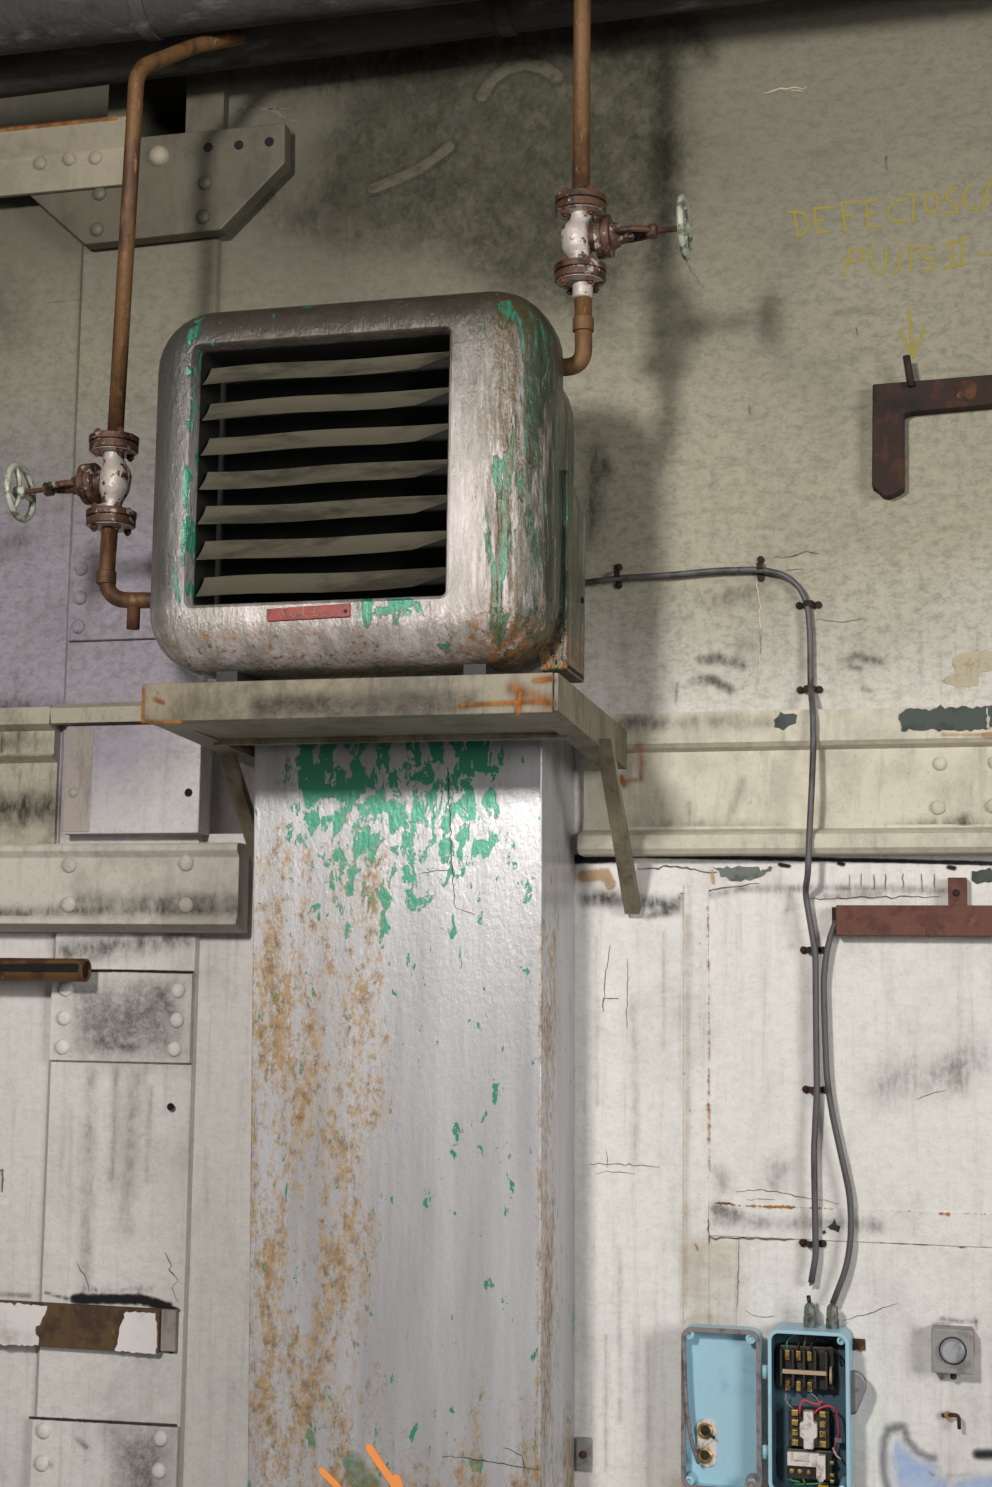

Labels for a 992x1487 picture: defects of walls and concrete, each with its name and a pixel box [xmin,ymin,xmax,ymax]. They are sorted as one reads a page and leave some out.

peeling [941,649,992,688]
peeling [899,705,992,732]